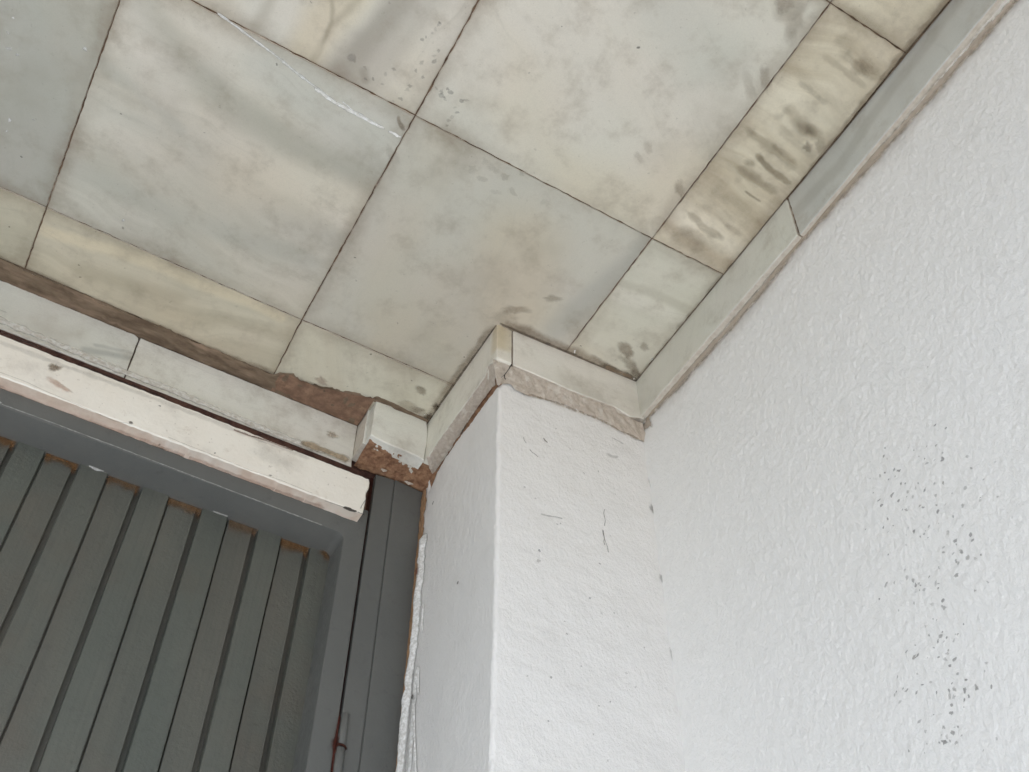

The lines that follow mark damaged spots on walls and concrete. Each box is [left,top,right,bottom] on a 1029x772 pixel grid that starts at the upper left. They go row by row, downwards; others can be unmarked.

spalling [0,259,428,425]
flaking render [354,359,645,772]